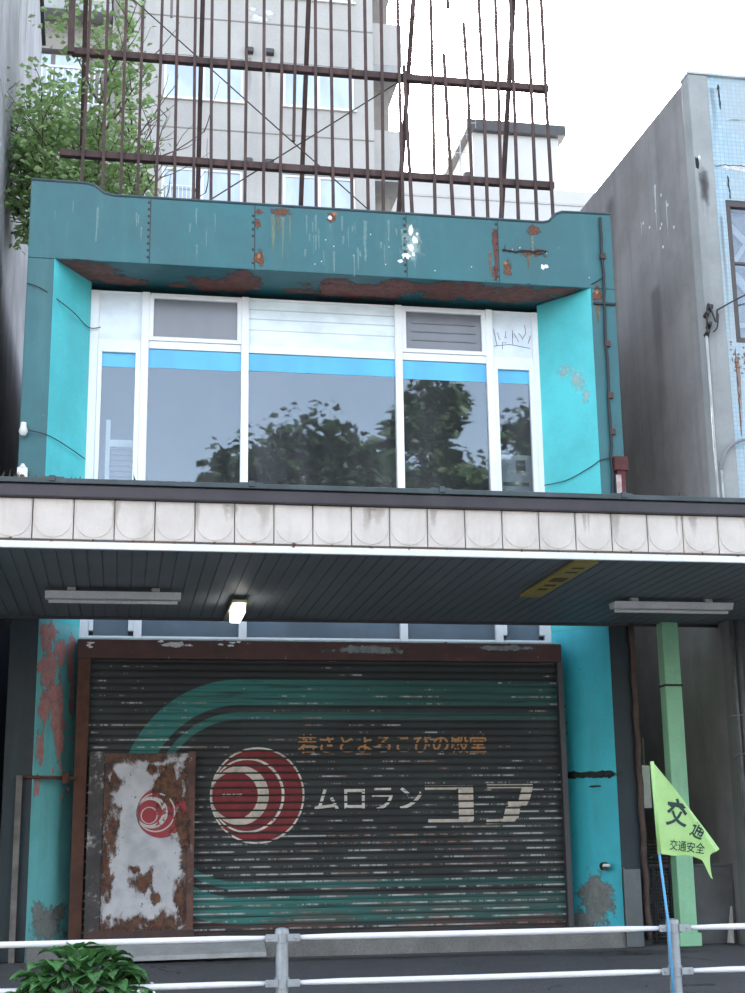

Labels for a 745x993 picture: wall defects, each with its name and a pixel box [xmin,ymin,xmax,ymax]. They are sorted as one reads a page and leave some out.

corrosion [254,208,292,232]
peeling [398,224,419,263]
corrosion [489,229,512,281]
peeling [283,278,579,306]
corrosion [730,341,745,436]
peeling [157,640,193,648]
peeling [469,643,533,651]
peeling [33,621,75,801]
peeling [574,871,616,927]